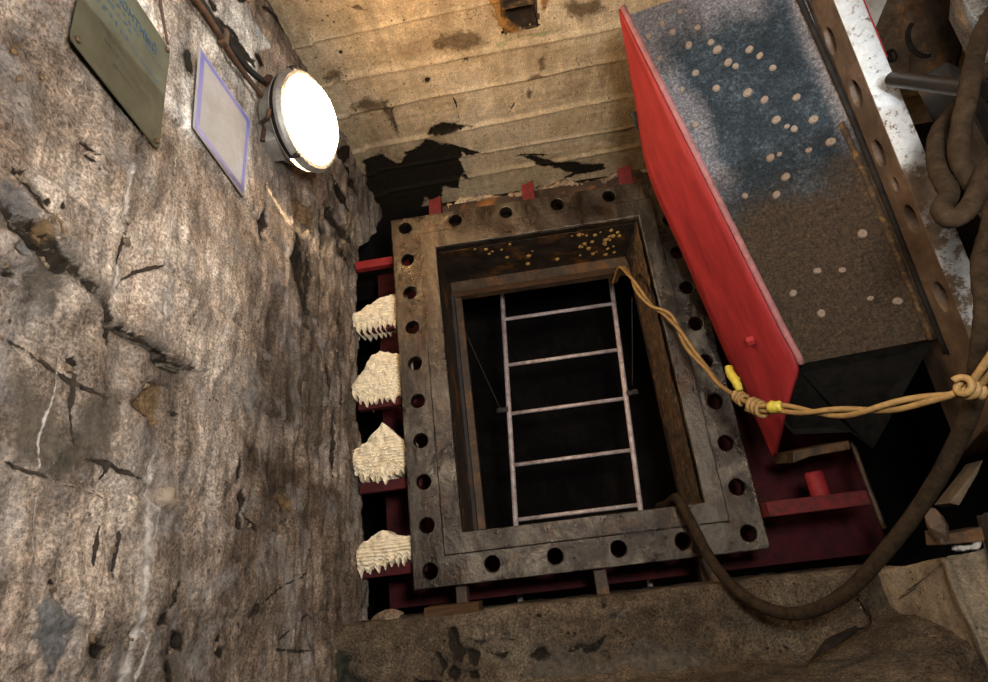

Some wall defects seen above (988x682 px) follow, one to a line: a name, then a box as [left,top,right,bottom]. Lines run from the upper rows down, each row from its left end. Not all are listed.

corrosion [489,0,531,33]
damp [565,0,604,17]
damp [434,31,481,51]
crack [0,169,195,380]
crack [0,335,142,499]